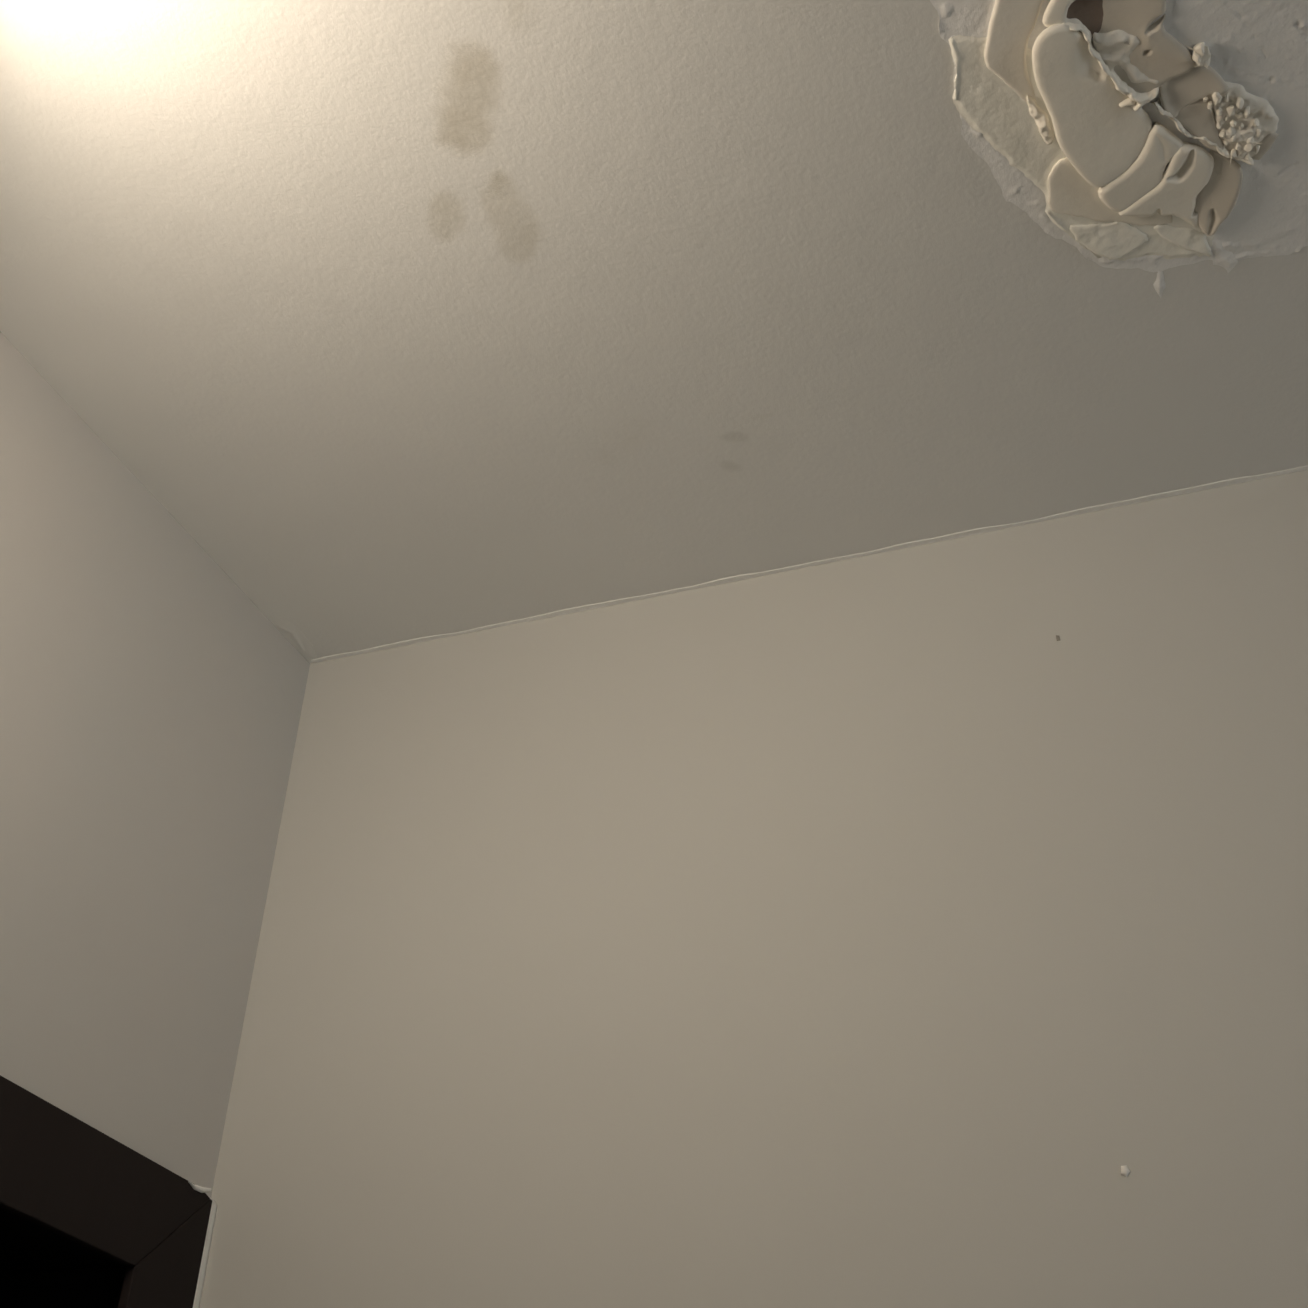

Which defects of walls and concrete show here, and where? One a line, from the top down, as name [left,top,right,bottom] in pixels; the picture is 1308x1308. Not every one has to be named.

peeling [949,0,1279,298]